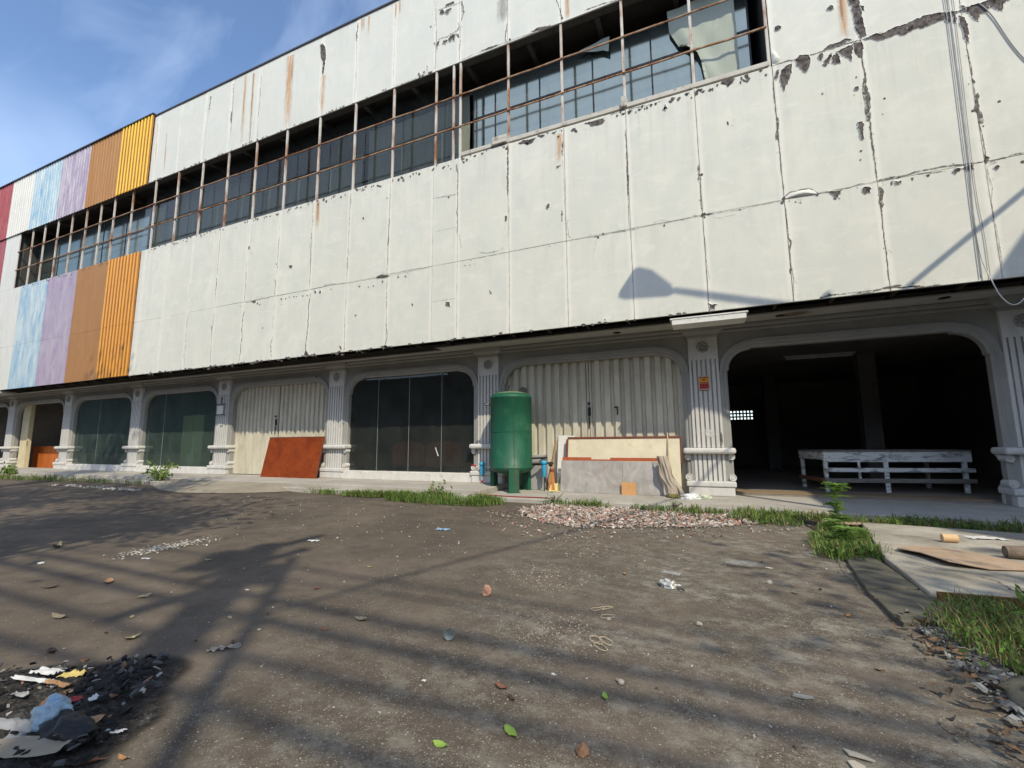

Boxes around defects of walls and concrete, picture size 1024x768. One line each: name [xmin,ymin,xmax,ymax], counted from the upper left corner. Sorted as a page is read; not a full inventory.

peeling [461,0,1010,163]